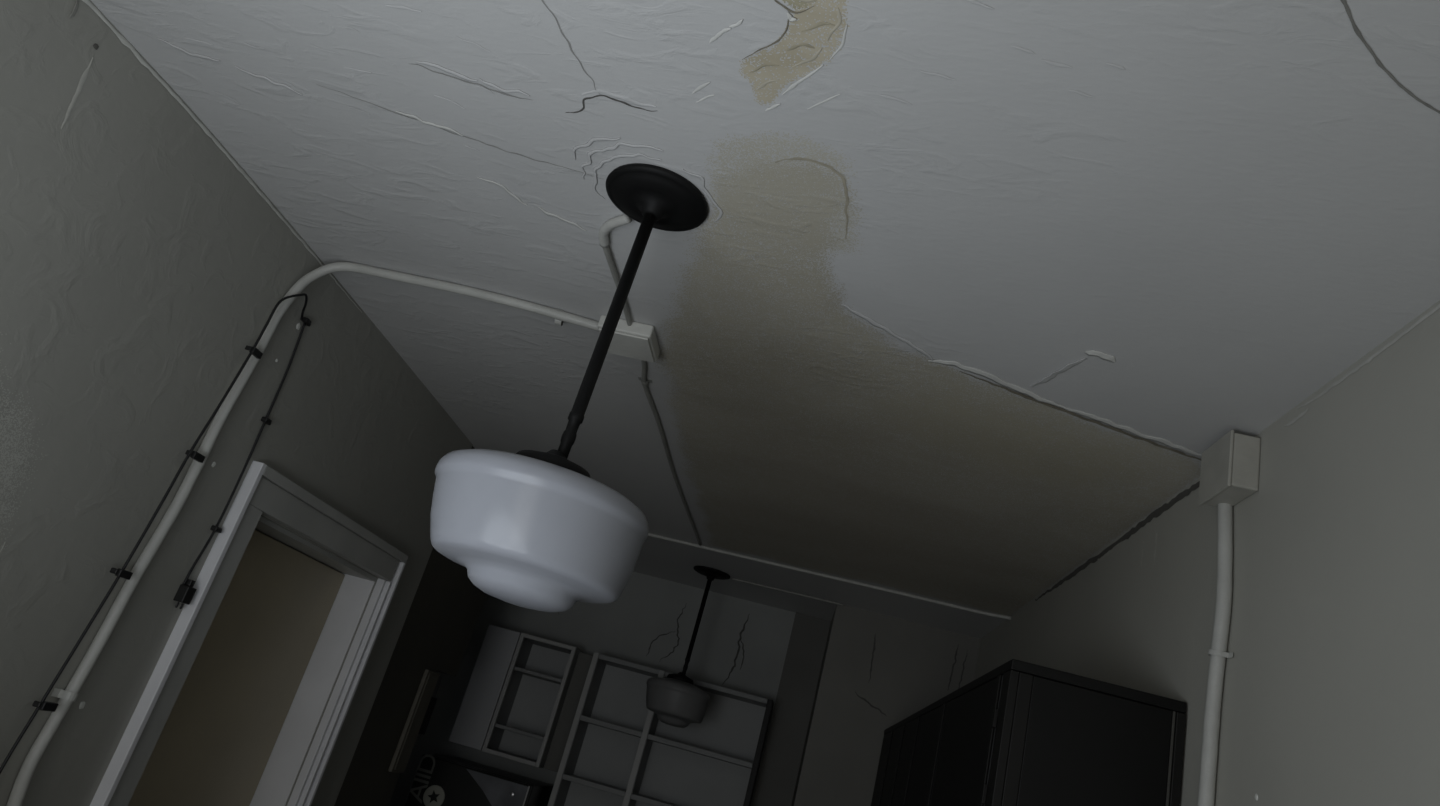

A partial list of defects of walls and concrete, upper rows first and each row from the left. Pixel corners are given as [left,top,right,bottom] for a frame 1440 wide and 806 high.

crack [541,0,656,113]
spalling [739,0,850,111]
crack [1340,0,1440,114]
leakage [656,130,1201,616]